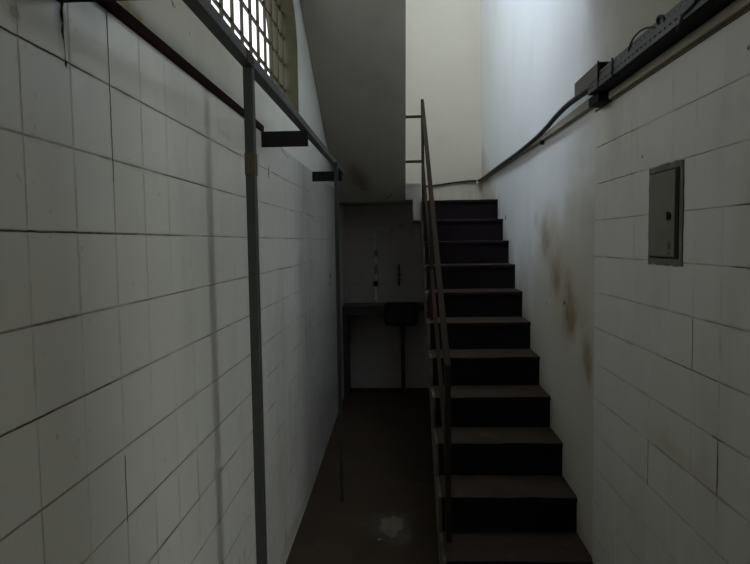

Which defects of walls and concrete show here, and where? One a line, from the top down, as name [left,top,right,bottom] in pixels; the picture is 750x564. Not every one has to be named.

crack [0,26,76,67]